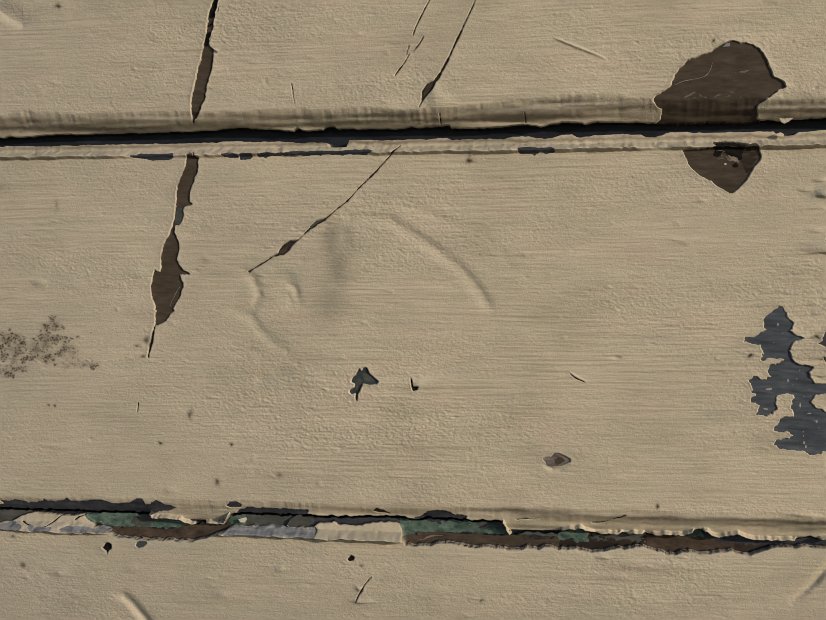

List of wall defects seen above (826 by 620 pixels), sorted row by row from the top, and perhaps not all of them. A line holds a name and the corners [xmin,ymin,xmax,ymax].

crack [395,0,430,75]
crack [419,4,474,107]
peeling [654,41,786,126]
peeling [682,141,761,194]
crack [248,146,400,273]
peeling [350,368,379,401]
peeling [744,306,826,455]
peeling [543,453,570,467]
peeling [0,497,826,556]